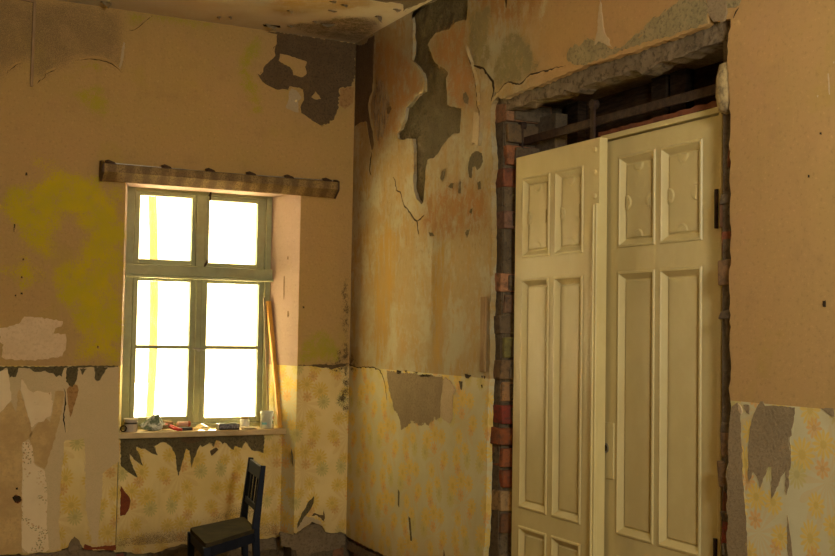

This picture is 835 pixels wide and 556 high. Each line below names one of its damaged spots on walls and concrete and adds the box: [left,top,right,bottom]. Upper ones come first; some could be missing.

damp [0,151,130,366]
peeling [256,24,376,153]
crack [393,177,424,235]
spalling [370,0,469,207]
peeling [440,111,484,194]
crack [465,45,566,146]
flaking render [0,384,147,556]
flaking render [238,516,382,556]